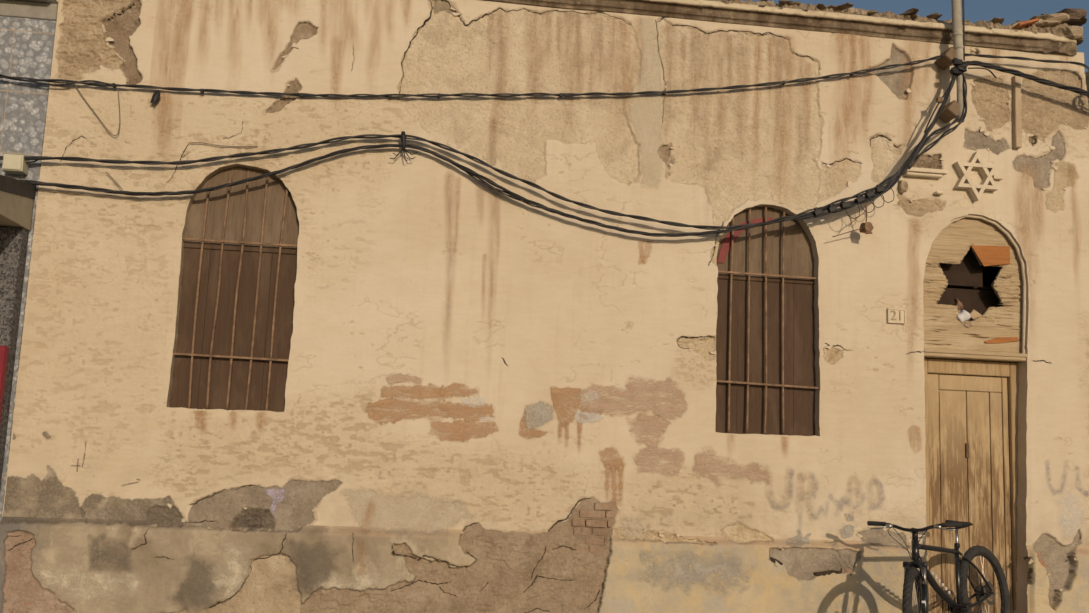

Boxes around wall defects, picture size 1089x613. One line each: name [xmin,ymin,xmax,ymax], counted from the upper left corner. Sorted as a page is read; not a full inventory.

spalling [54,0,142,85]
spalling [265,78,302,113]
spalling [273,22,318,70]
peeling [399,0,642,184]
crack [398,0,816,122]
peeling [657,18,905,265]
spalling [868,46,913,100]
spalling [964,69,1089,211]
spalling [677,337,716,361]
spalling [0,476,342,613]
spalling [173,374,862,613]
spalling [1028,529,1082,610]